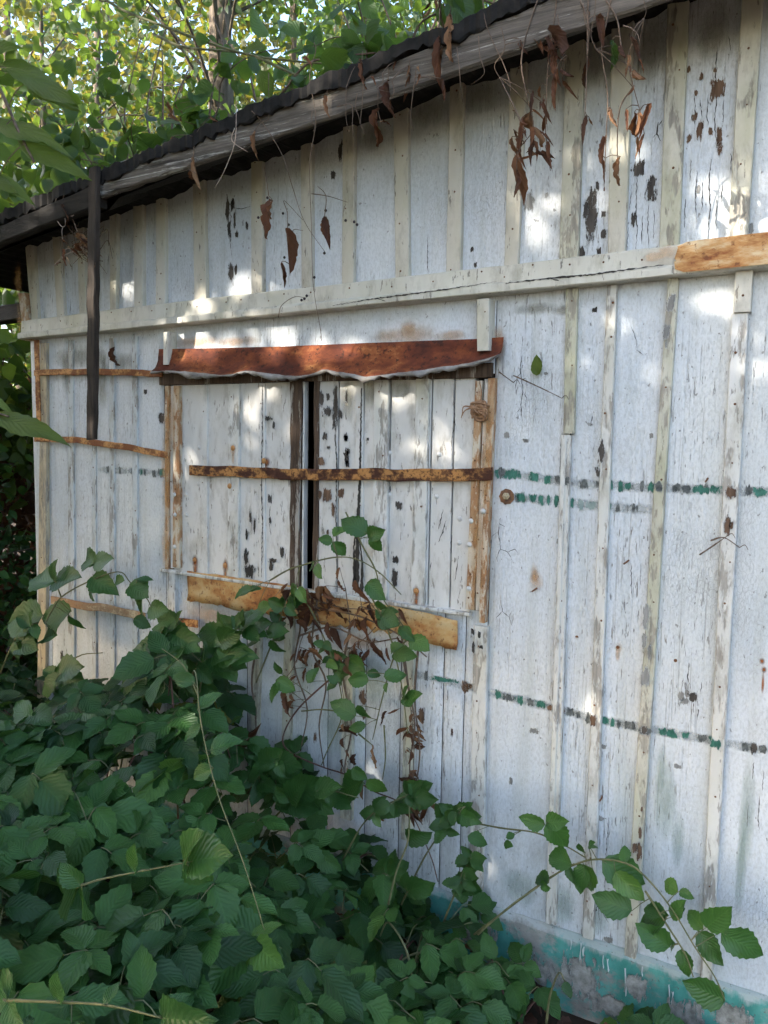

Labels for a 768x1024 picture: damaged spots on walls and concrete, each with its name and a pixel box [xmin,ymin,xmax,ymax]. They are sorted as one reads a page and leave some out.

peeling [687,66,727,102]
peeling [686,112,723,156]
peeling [630,158,658,202]
peeling [225,195,249,242]
peeling [580,181,607,256]
peeling [228,262,237,281]
peeling [318,385,350,467]
peeling [493,439,768,513]
peeling [242,494,284,580]
peeling [724,514,734,535]
peeling [391,556,399,589]
spalling [507,949,754,1024]